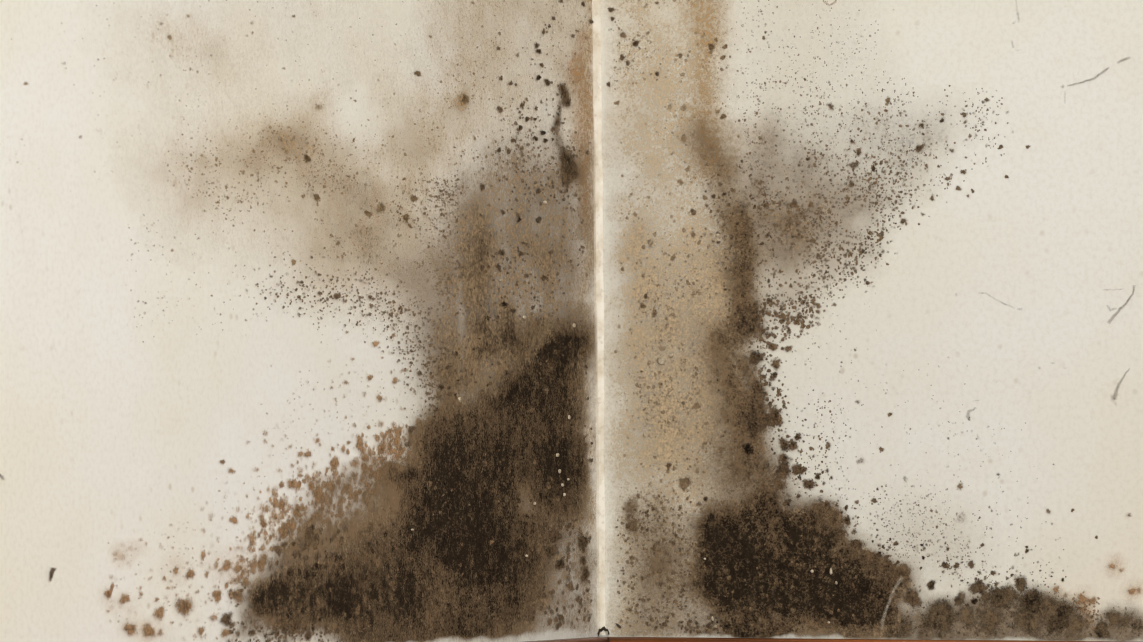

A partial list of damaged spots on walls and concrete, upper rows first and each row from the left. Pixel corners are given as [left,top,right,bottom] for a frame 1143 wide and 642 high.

damp [168,0,596,642]
damp [607,0,1143,641]